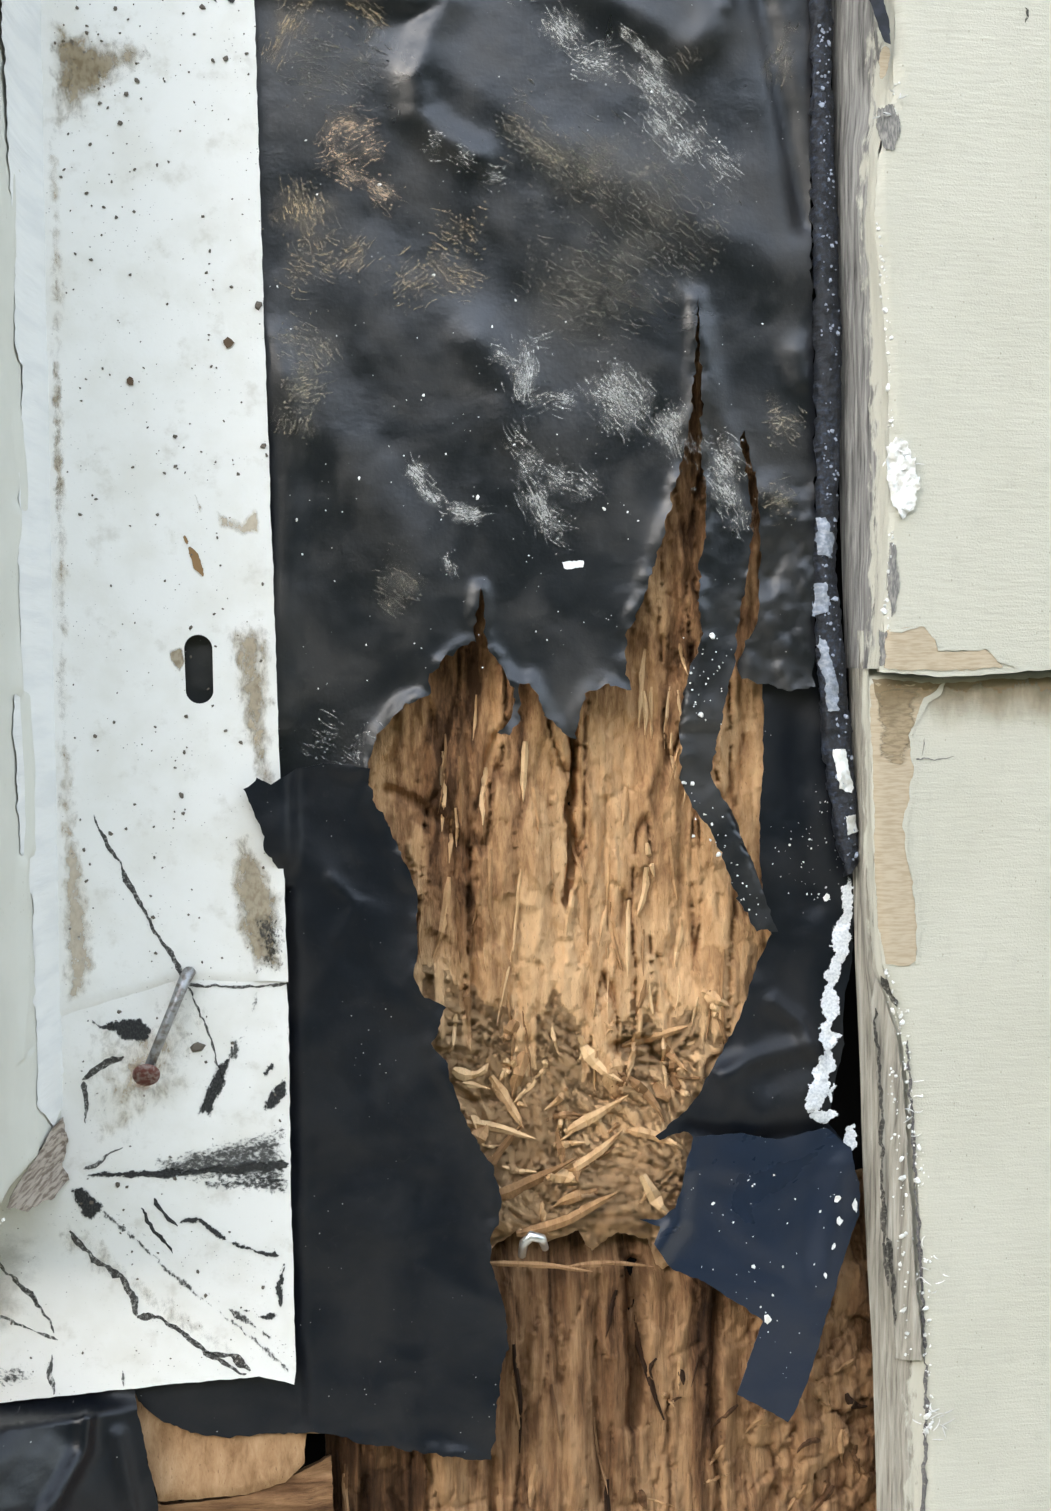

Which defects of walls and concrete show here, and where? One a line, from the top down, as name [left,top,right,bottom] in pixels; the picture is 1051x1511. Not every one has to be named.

damp [59,45,73,87]
peeling [562,560,584,569]
peeling [870,542,1002,966]
peeling [809,1083,857,1150]
peeling [834,1196,858,1226]